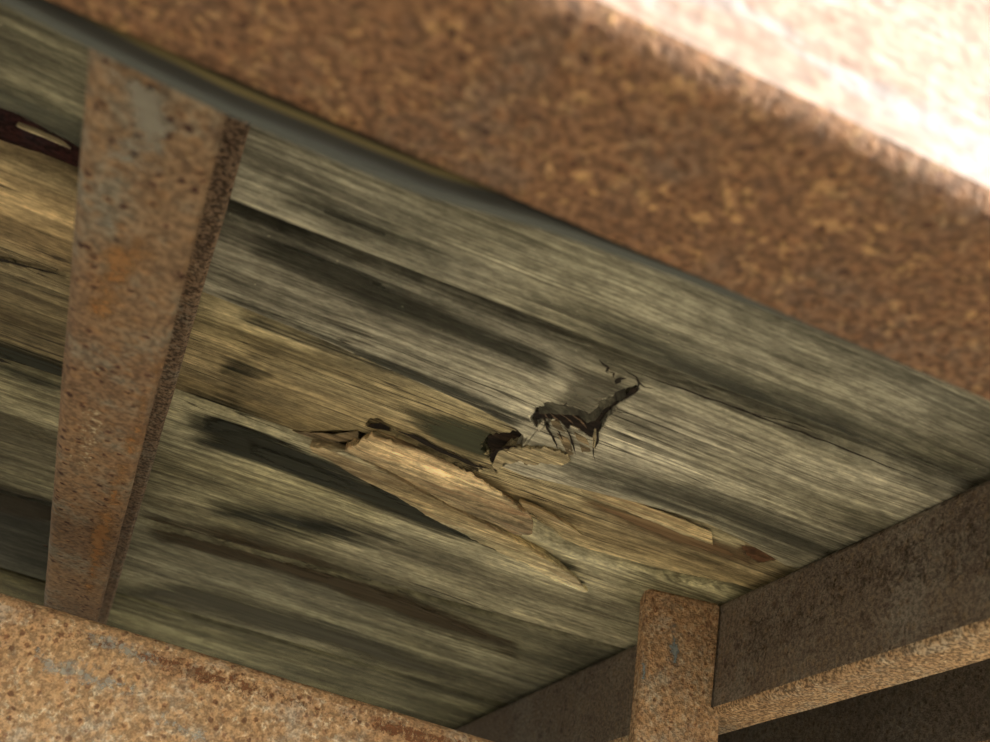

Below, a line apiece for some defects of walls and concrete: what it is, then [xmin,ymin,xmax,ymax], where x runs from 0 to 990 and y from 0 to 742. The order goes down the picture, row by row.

rust [0,108,81,168]
crack [0,258,68,278]
peeling [486,389,626,470]
crack [543,408,638,459]
crack [599,360,937,486]
peeling [580,489,713,545]